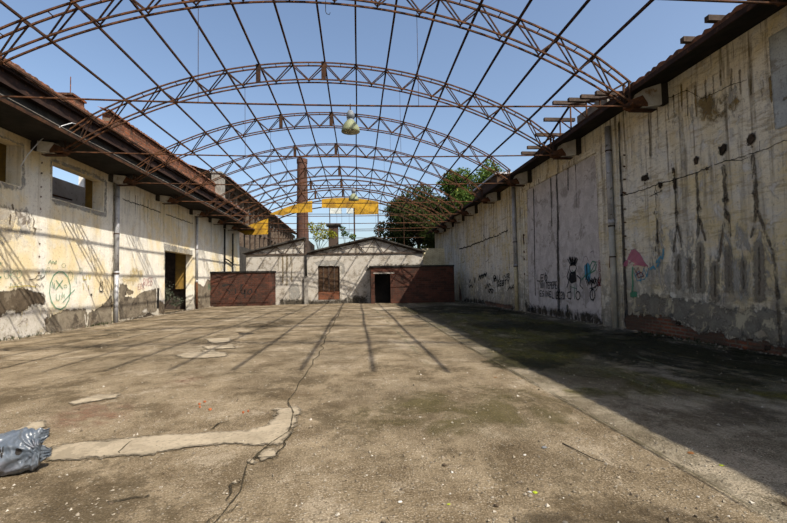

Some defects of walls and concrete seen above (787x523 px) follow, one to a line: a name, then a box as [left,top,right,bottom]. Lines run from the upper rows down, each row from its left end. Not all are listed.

crack [620,140,787,197]
peeling [0,204,42,245]
damp [405,122,787,389]
peeling [0,283,165,340]
flaking render [624,312,787,356]
crack [50,435,150,453]
crack [206,309,341,523]